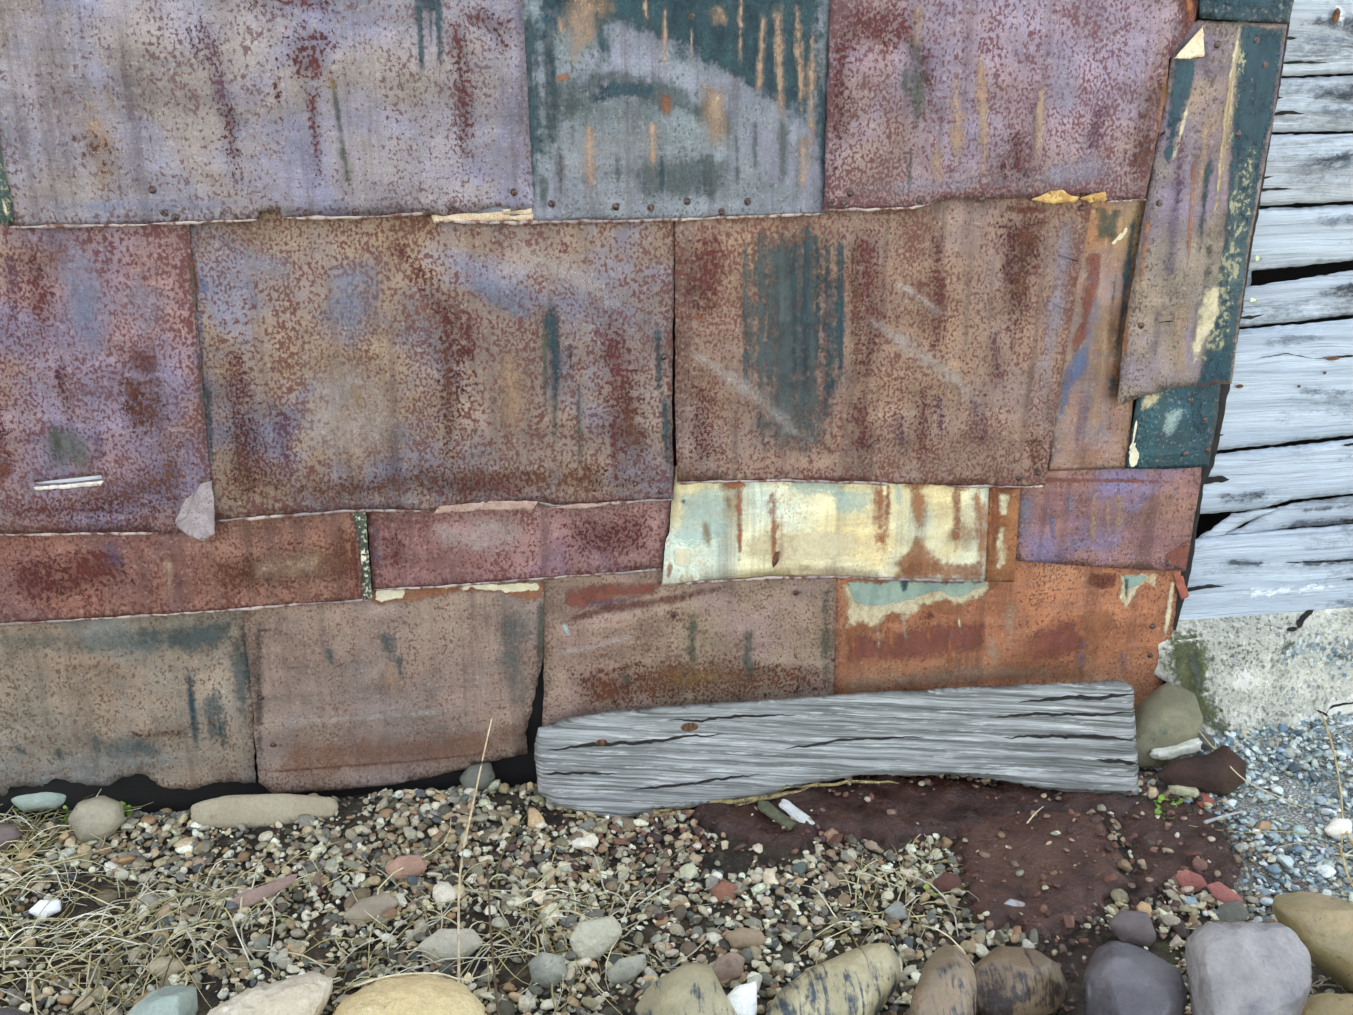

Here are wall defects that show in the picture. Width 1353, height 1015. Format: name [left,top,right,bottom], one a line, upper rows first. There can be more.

rust [185,15,245,181]
rust [248,0,341,187]
rust [446,7,512,173]
rust [757,3,936,173]
peeling [1174,26,1205,59]
rust [11,352,198,523]
rust [220,242,658,504]
peeling [667,548,690,576]
rust [873,486,890,544]
rust [846,229,947,468]
rust [897,484,1009,578]
rust [970,206,1048,444]